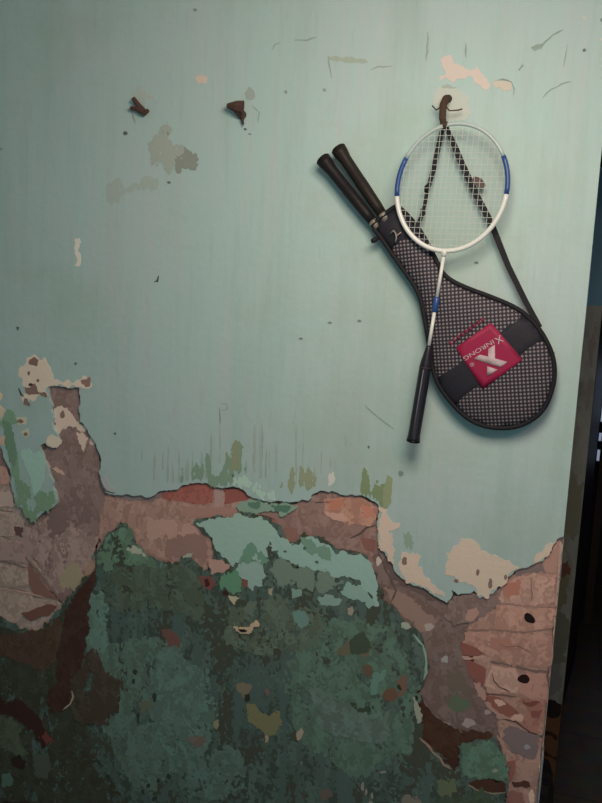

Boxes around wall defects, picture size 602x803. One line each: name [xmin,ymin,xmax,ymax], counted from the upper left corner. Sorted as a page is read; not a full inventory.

peeling [433,55,513,122]
peeling [18,354,92,406]
flaking render [0,554,58,630]
water stain [0,409,530,803]
peeling [101,472,563,803]
crack [464,628,552,697]
crack [497,579,552,608]
water stain [552,563,570,665]
flaking render [0,697,53,787]